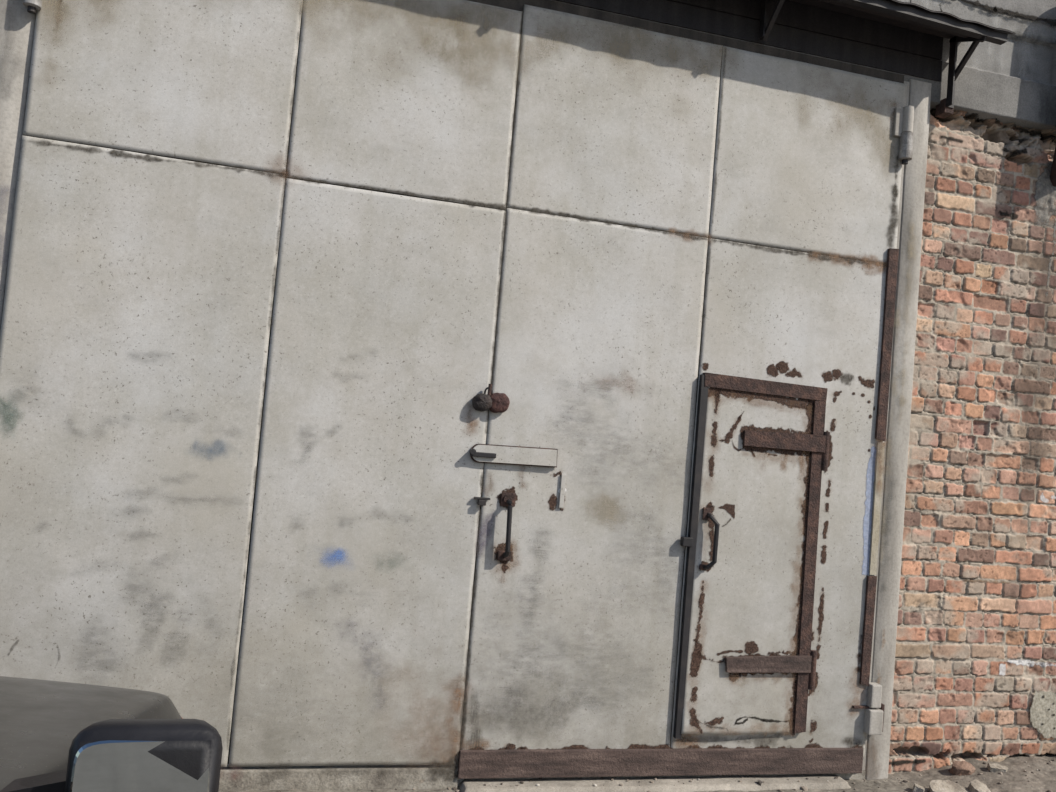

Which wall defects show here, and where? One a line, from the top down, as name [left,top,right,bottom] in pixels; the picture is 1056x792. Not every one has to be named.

water stain [609,33,641,57]
spalling [1002,138,1028,157]
rust [740,424,812,468]
rust [497,487,518,508]
rust [700,506,715,572]
rust [494,543,513,573]
rust [717,641,798,661]
rust [729,673,797,682]
rust [627,734,792,749]